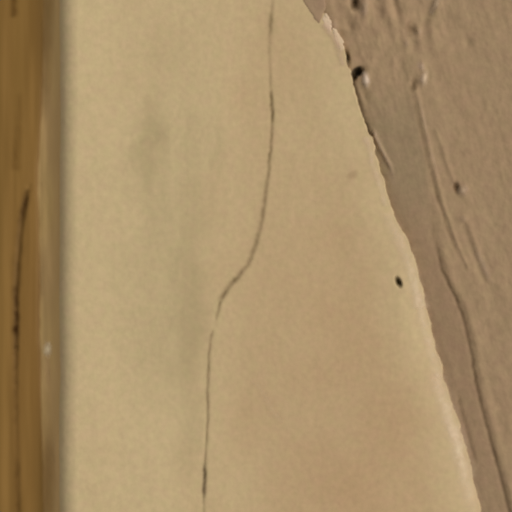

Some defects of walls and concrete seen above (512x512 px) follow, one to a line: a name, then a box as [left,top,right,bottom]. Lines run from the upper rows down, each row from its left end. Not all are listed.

spalling [303,0,512,512]